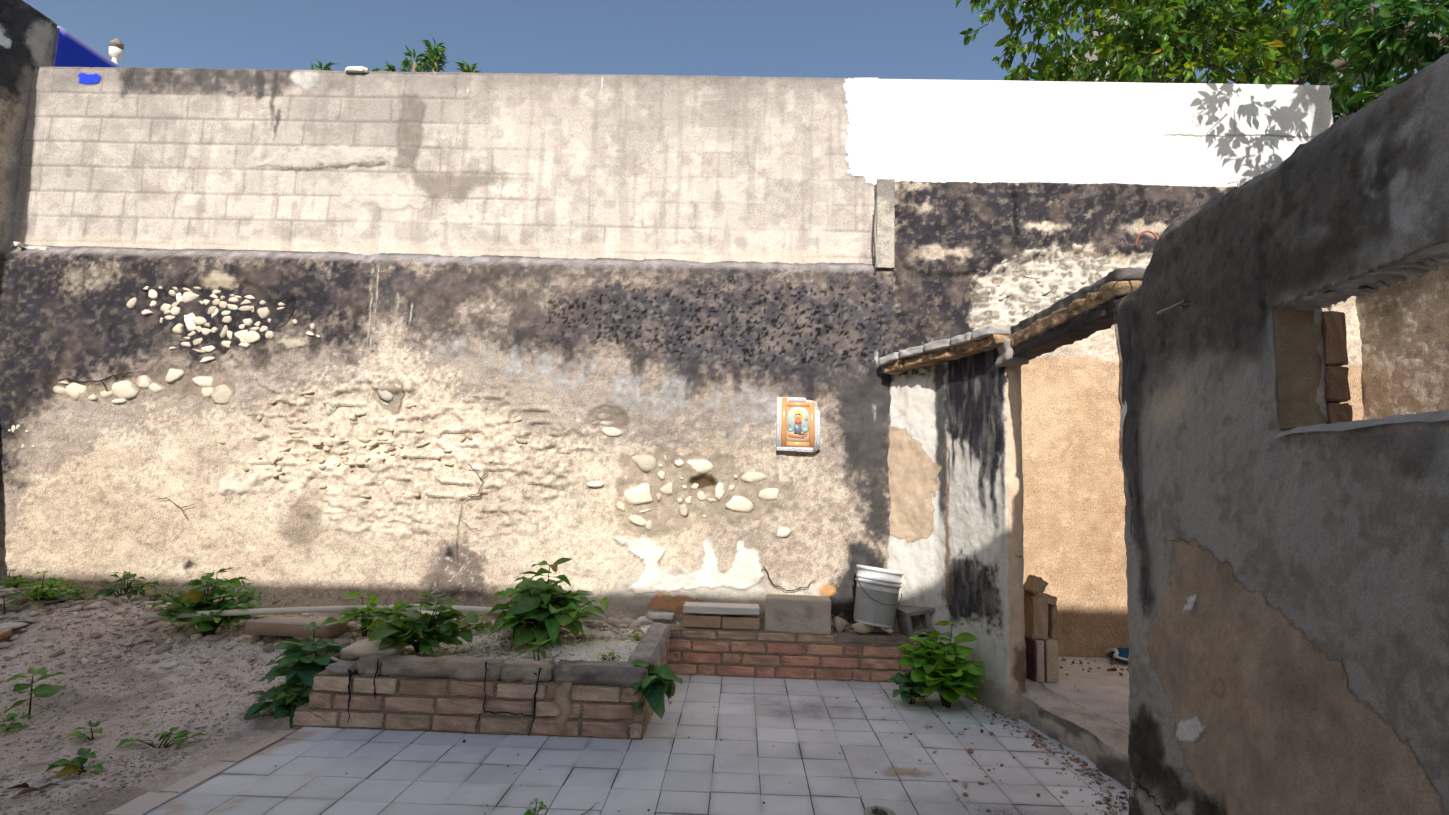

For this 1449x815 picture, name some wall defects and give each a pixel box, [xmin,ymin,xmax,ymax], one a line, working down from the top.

water stain [395,94,496,202]
spalling [53,270,321,404]
spalling [592,407,627,437]
water stain [0,181,1237,634]
spalling [586,447,796,619]
flaking render [887,426,942,543]
water stain [1114,288,1261,614]
crack [1127,771,1178,815]